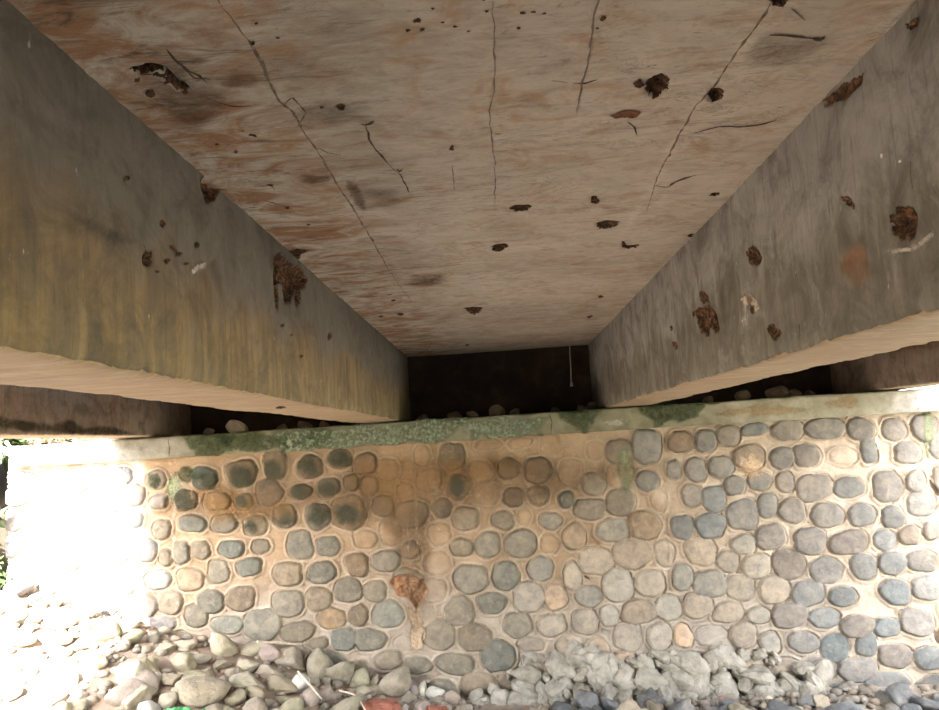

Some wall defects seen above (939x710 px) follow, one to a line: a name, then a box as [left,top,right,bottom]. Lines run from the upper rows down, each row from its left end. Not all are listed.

crack [771,9,826,42]
crack [551,0,600,108]
spalling [129,63,190,98]
crack [488,8,496,207]
spalling [633,73,670,99]
spalling [822,74,863,107]
crack [361,121,410,193]
spalling [889,206,933,253]
spalling [692,291,720,337]
leakage [0,416,127,435]
leakage [205,490,279,519]
leakage [337,463,560,606]